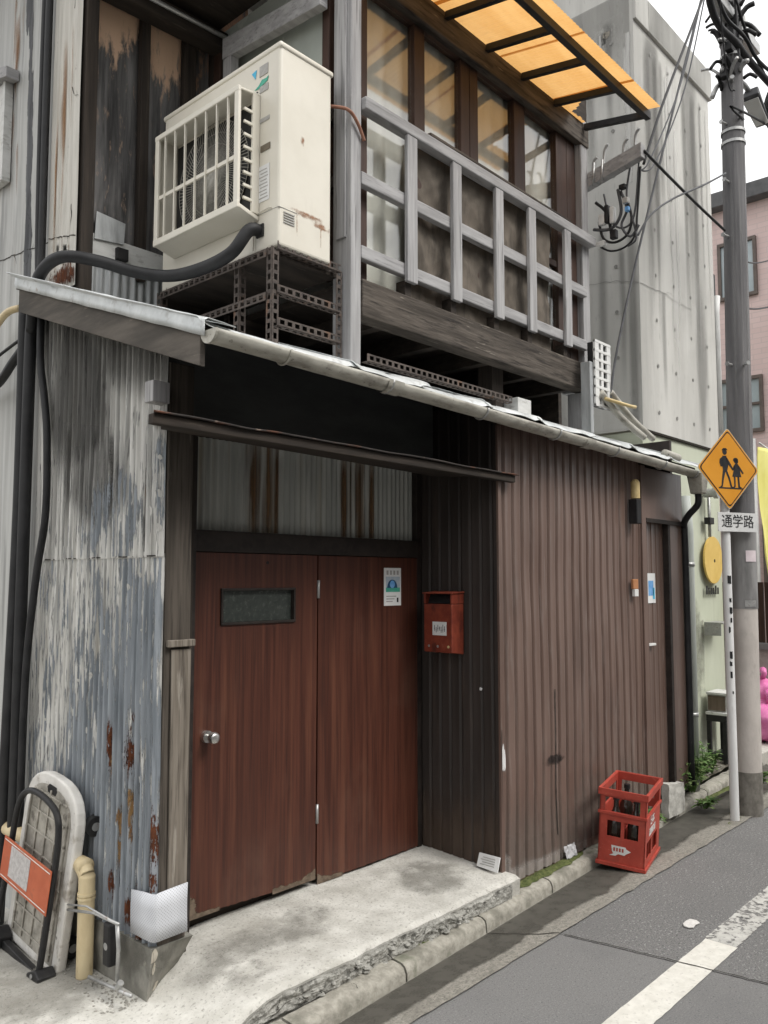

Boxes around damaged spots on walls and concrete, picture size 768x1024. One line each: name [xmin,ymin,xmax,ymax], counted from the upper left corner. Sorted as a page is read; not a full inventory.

water stain [54,326,122,500]
peeling [27,433,166,991]
rust [106,715,135,775]
rust [107,789,134,900]
rust [149,805,159,894]
water stain [656,791,730,858]
rust [124,888,142,940]
spalling [245,885,513,1024]
water stain [339,864,631,1024]